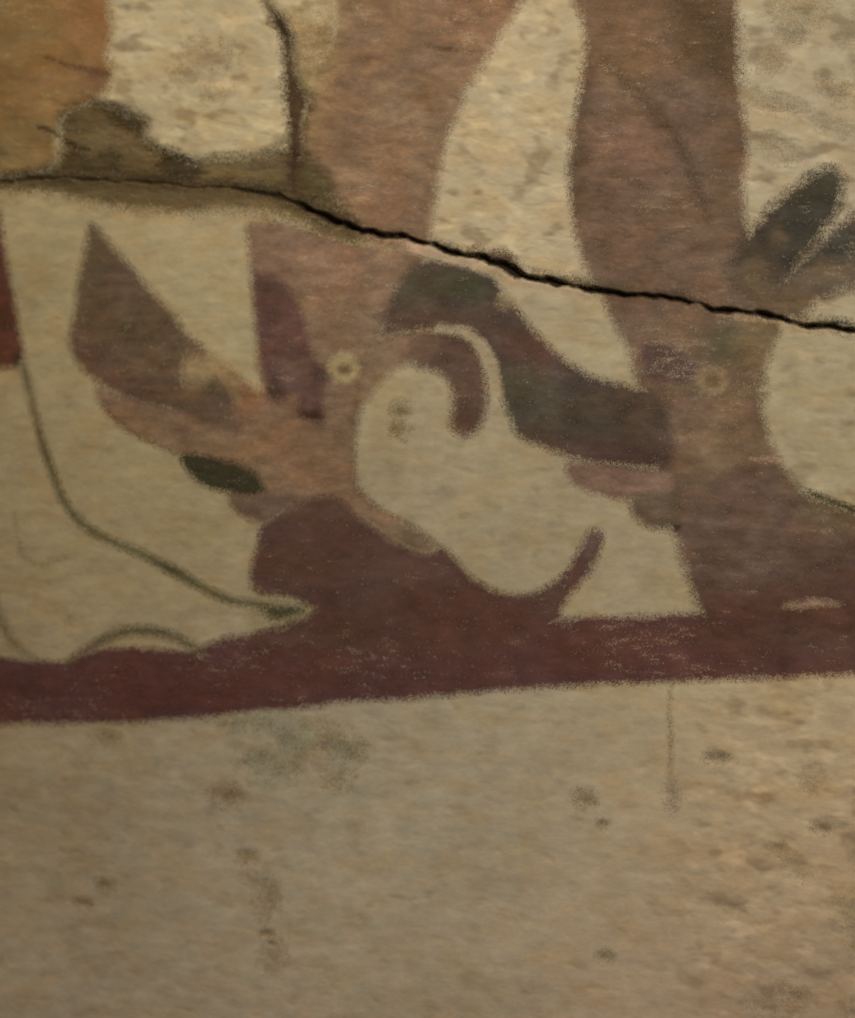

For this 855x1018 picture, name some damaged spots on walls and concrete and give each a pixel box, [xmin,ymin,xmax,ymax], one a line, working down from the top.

crack [0,0,855,342]